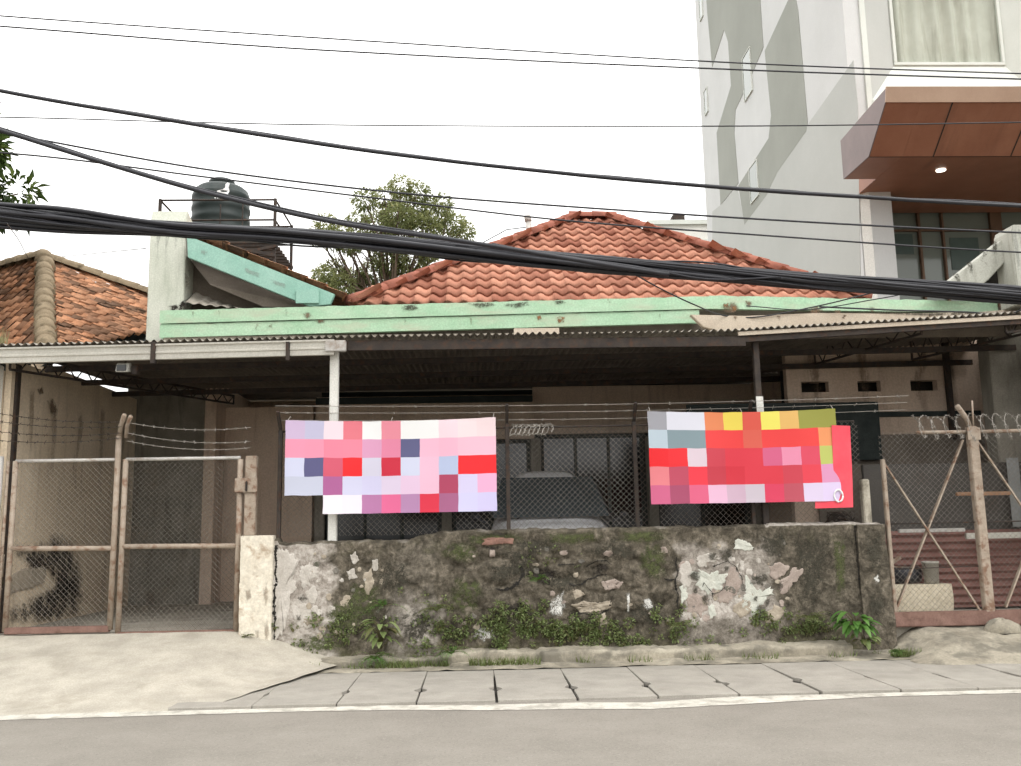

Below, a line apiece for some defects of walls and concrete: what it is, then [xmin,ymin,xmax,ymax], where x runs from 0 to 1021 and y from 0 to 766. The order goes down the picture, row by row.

spalling [272,548,387,640]
spalling [462,613,494,639]
spalling [482,532,624,626]
peeling [679,539,803,623]